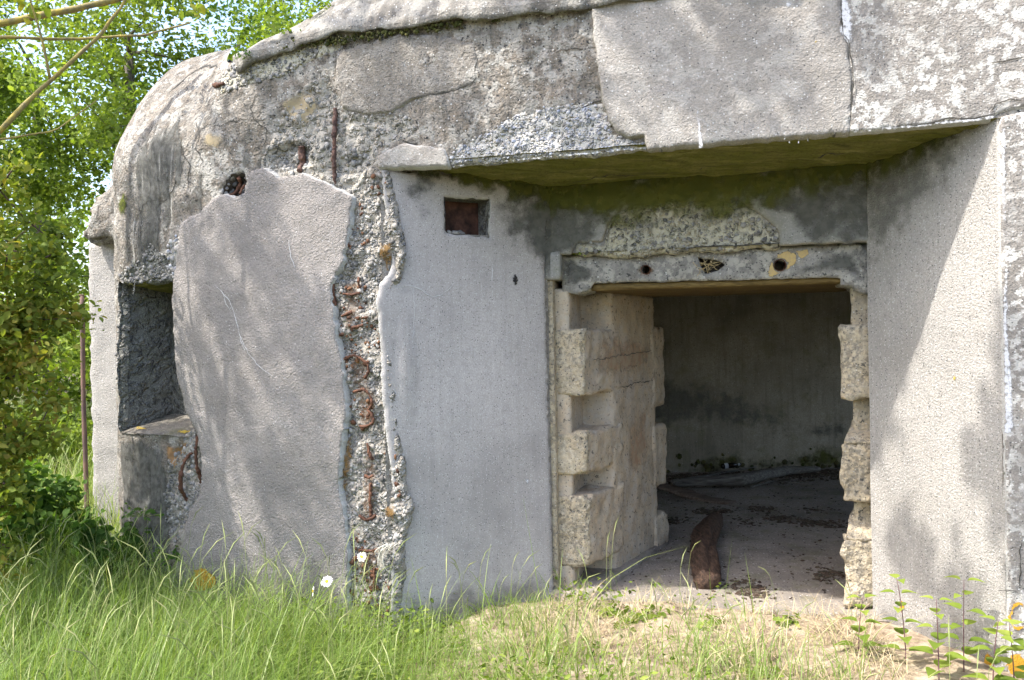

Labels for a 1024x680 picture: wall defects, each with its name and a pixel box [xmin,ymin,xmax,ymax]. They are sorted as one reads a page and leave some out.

spalling [218,35,346,94]
crack [841,0,863,130]
rust [297,146,306,173]
spalling [450,102,646,169]
rust [332,277,364,330]
spalling [261,71,417,629]
rust [343,354,375,428]
rust [167,436,202,502]
rust [342,439,352,496]
rust [358,474,395,522]